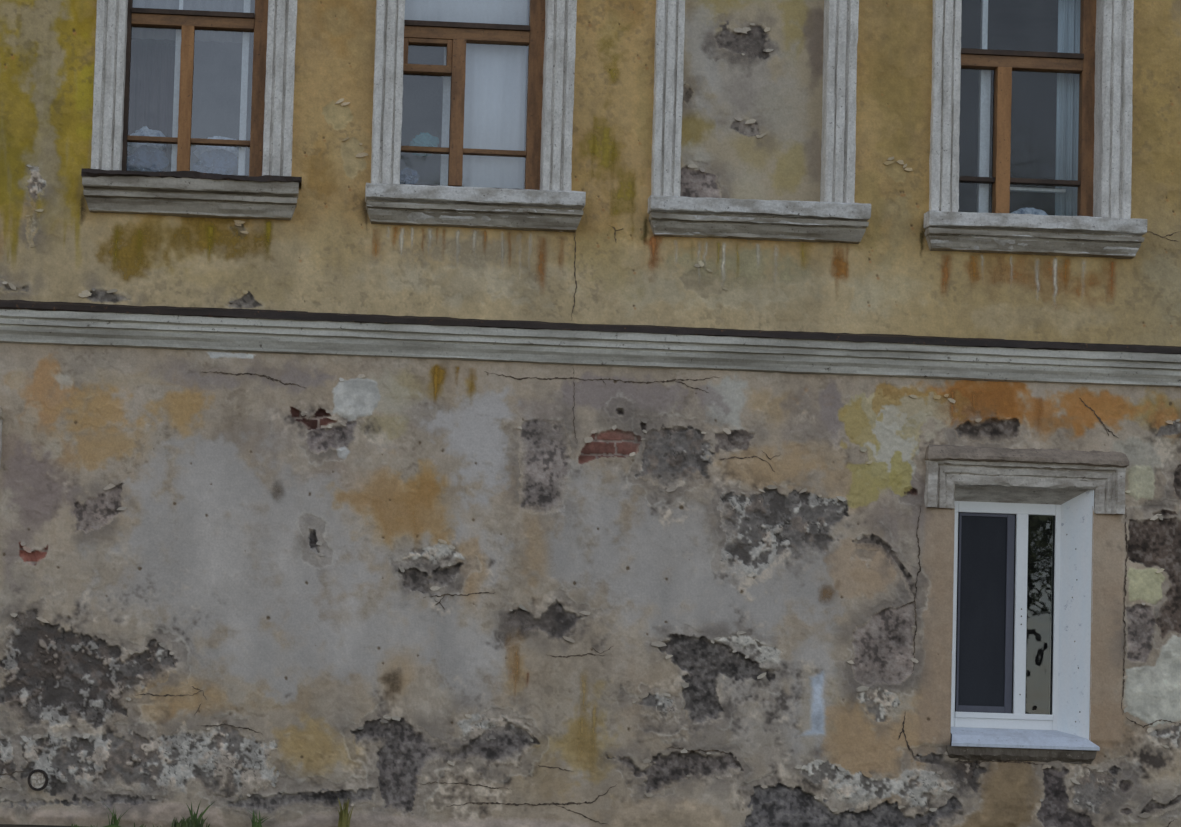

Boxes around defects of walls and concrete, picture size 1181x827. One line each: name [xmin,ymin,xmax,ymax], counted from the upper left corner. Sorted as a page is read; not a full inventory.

crack [570,231,578,317]
peeling [290,374,382,460]
spalling [517,407,755,516]
spalling [398,539,466,595]
spalling [507,598,590,644]
spalling [717,485,919,724]
crack [902,508,921,674]
spalling [1122,464,1181,751]
spalling [0,609,541,821]
spalling [607,749,746,799]
spalling [745,752,989,827]
crack [898,716,914,757]